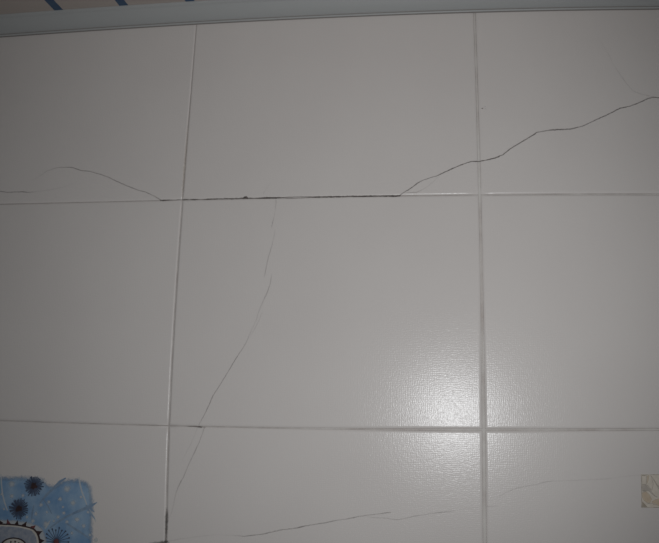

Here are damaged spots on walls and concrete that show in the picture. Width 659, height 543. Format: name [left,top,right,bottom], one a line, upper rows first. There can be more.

crack [193,194,281,202]
crack [314,192,399,200]